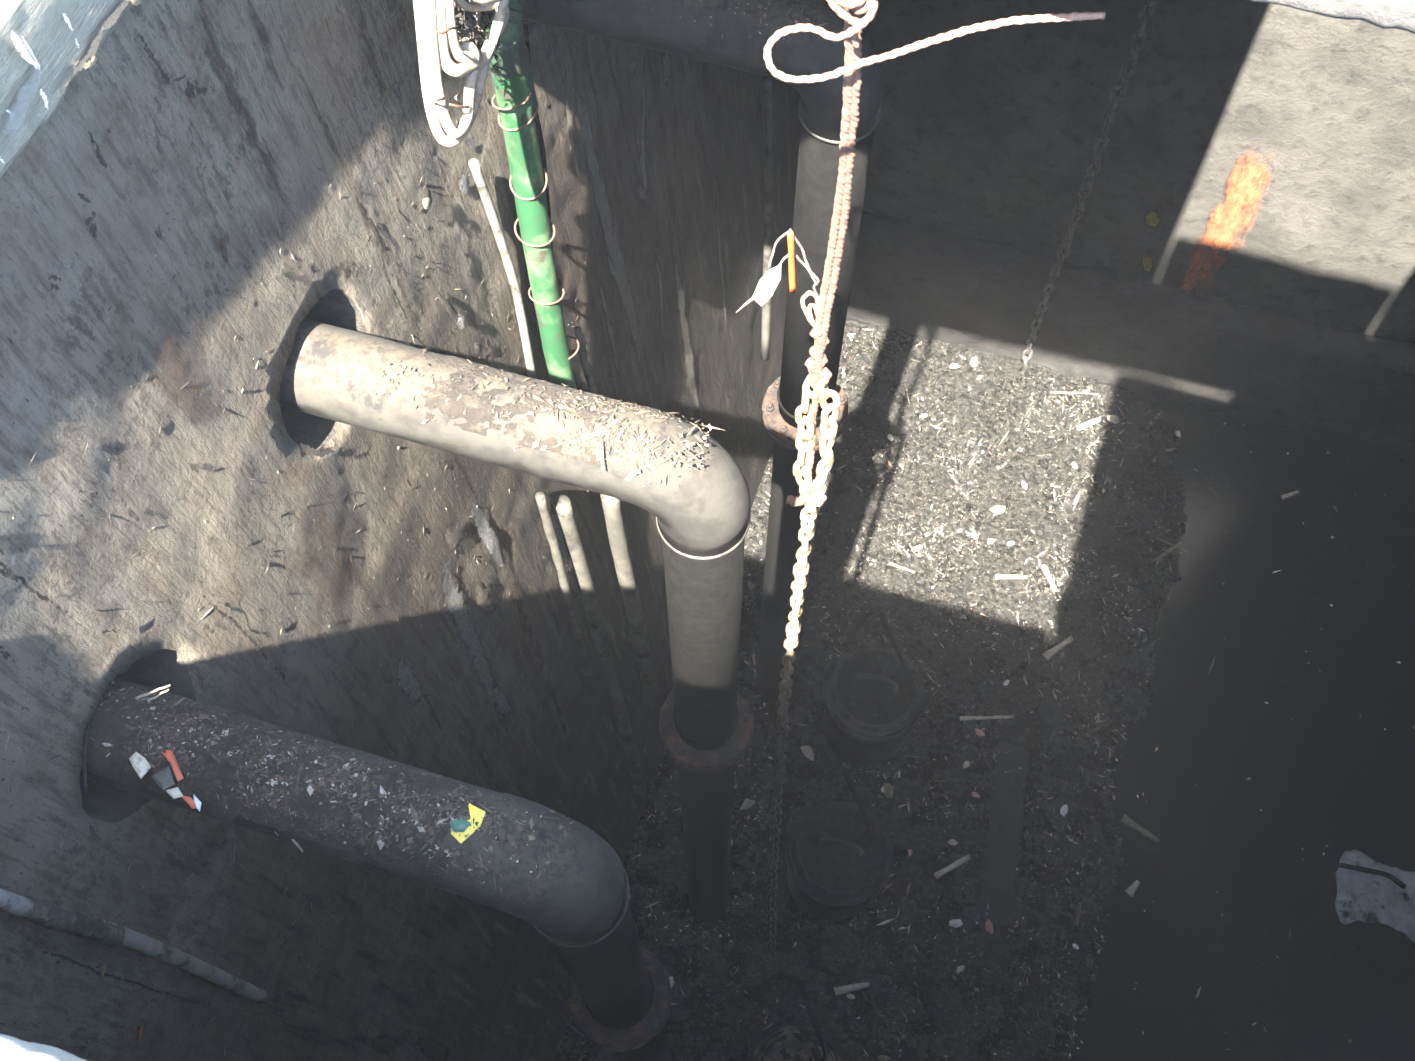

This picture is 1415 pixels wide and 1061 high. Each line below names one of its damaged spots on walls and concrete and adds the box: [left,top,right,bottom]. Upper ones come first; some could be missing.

crack [0,549,116,634]